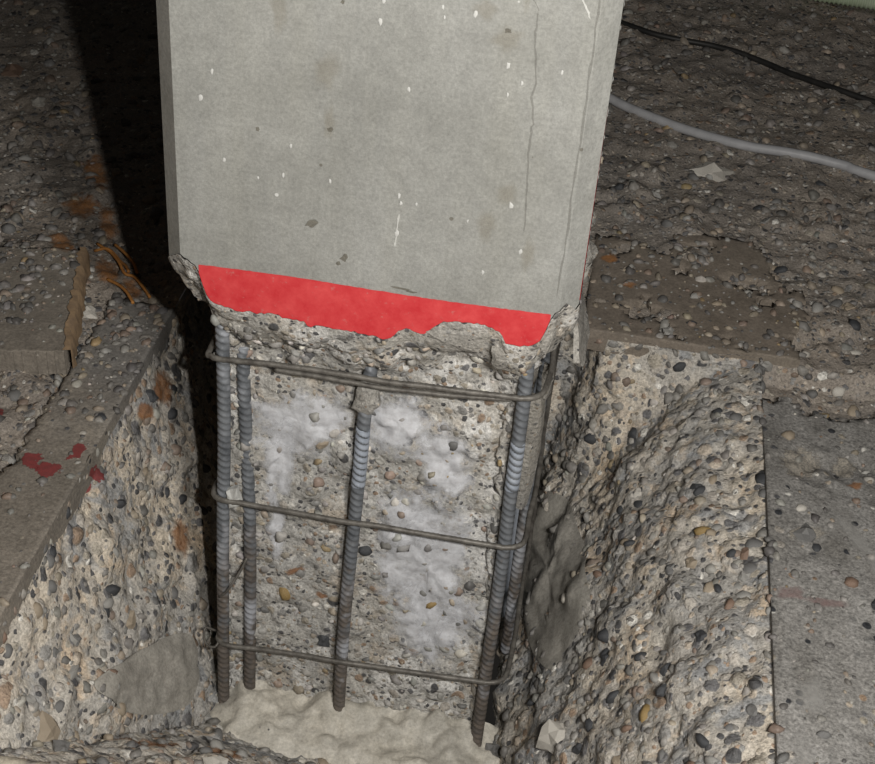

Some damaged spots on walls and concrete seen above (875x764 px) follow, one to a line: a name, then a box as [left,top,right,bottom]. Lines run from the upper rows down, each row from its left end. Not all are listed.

leakage [252,392,351,558]
spalling [0,181,775,764]
leakage [371,398,483,661]